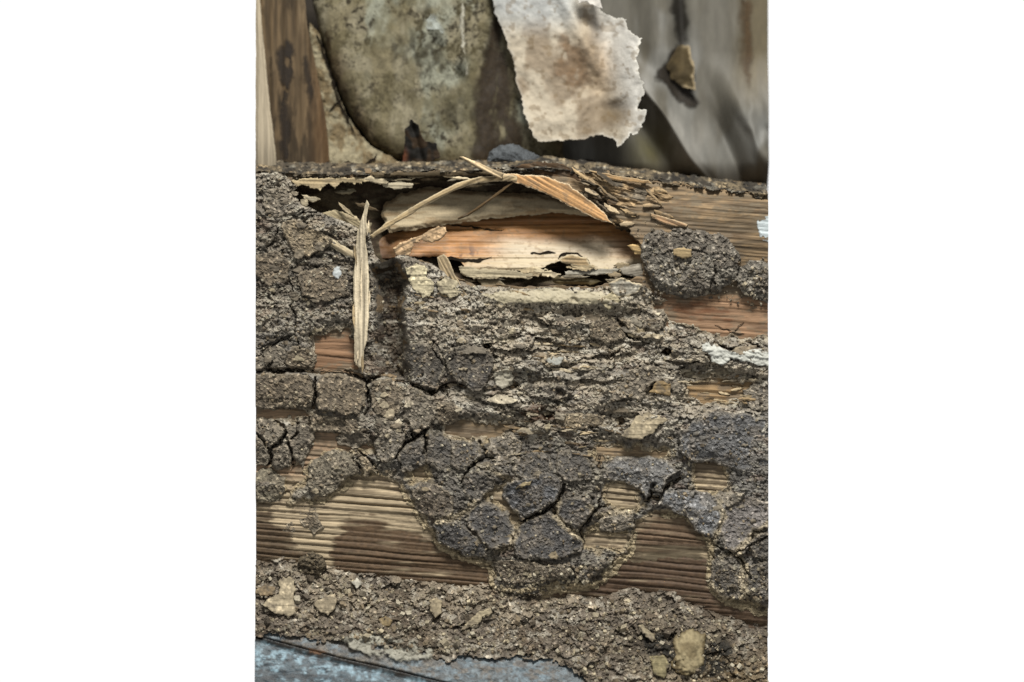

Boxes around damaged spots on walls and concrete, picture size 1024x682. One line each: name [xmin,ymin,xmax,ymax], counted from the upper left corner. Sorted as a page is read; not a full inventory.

peeling [673,247,692,259]
peeling [399,263,461,300]
crack [594,319,640,358]
crack [667,323,761,365]
crack [256,283,464,472]
crack [463,443,494,479]
peeling [255,319,769,608]
crack [520,485,564,522]
crack [579,456,607,539]
crack [647,477,681,502]
crack [723,538,766,577]